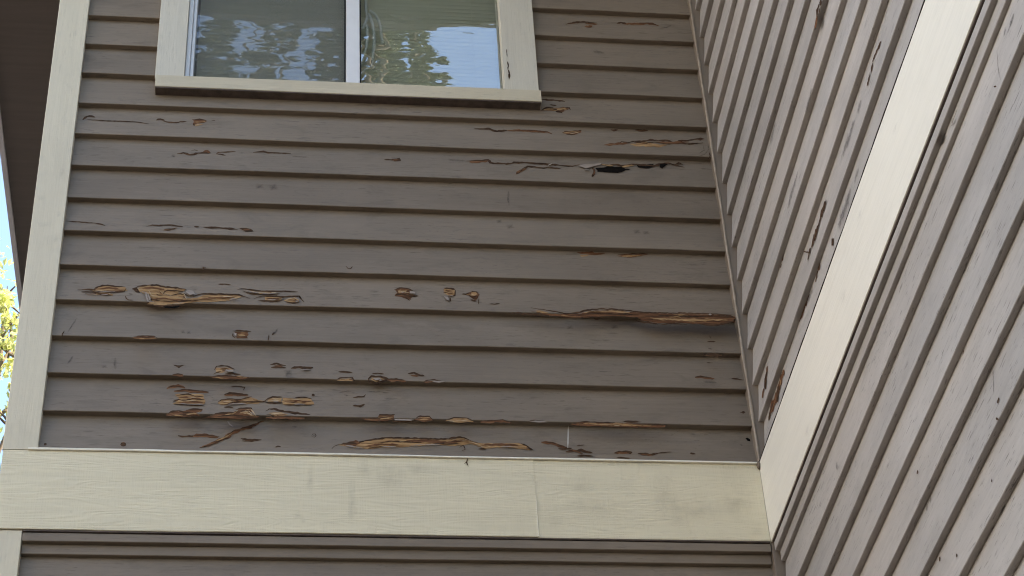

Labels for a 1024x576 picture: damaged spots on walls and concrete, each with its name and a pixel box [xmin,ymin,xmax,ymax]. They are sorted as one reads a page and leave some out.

peeling [80,284,304,308]
peeling [394,287,418,301]
peeling [443,288,500,304]
peeling [167,365,314,408]
peeling [368,373,406,384]
peeling [178,421,264,448]
peeling [335,436,592,456]